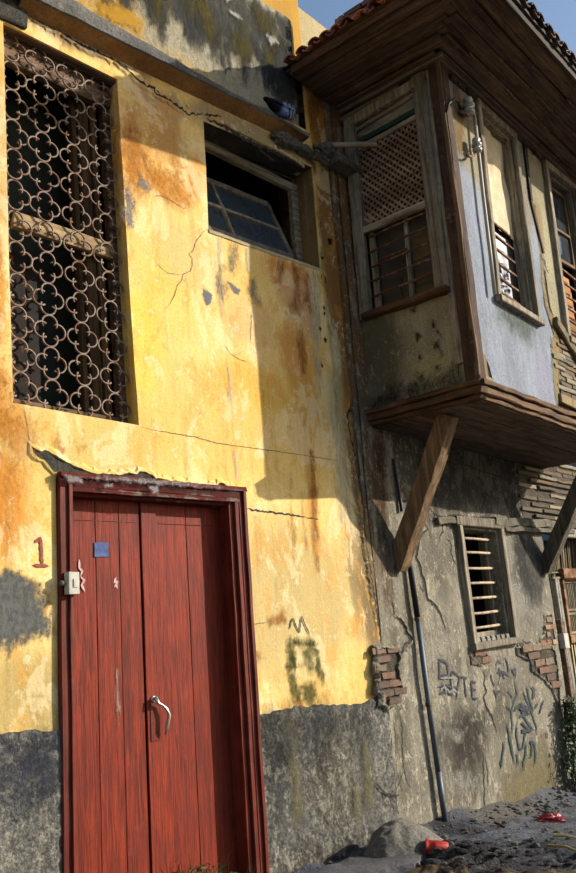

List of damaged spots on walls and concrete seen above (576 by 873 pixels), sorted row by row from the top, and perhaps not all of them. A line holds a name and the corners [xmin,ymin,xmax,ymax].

crack [27,17,305,170]
damp [102,0,299,121]
crack [158,228,208,309]
spalling [26,441,241,493]
crack [143,381,414,659]
corrosion [310,449,318,535]
crack [415,458,490,633]
flaking render [371,641,407,712]
flaking render [515,611,562,707]